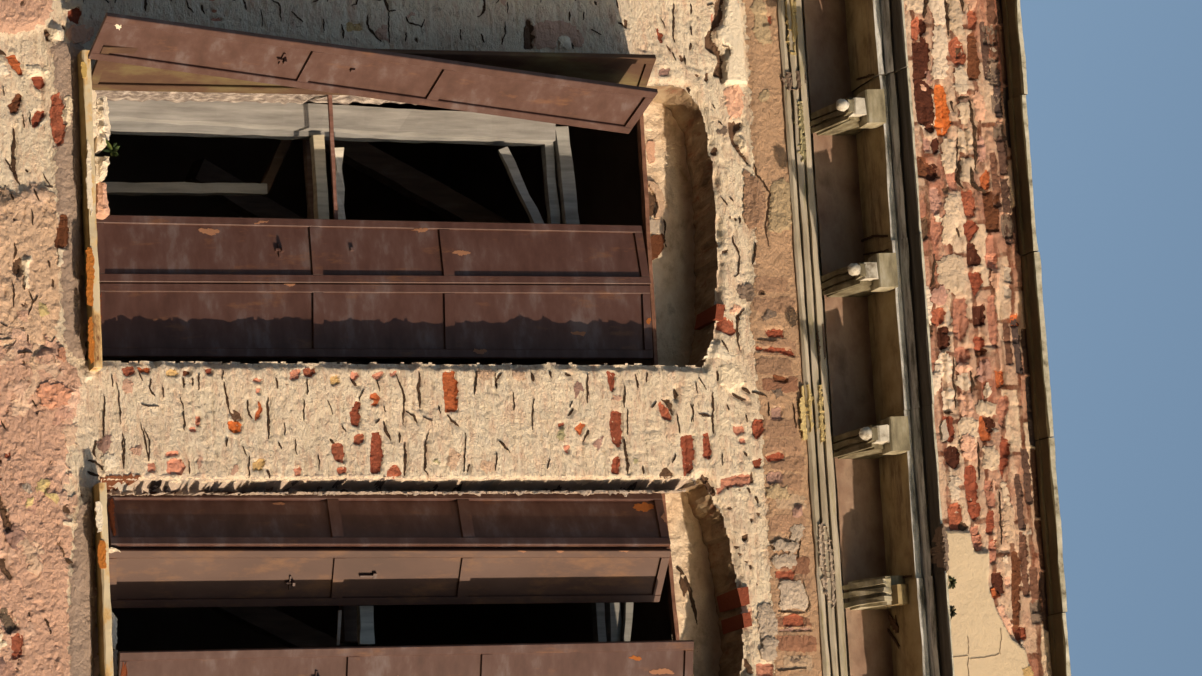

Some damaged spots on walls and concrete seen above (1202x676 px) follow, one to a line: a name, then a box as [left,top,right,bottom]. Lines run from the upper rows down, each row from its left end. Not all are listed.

flaking render [694,304,735,336]
flaking render [756,329,794,357]
flaking render [733,407,781,444]
flaking render [716,452,784,495]
flaking render [775,570,795,580]
flaking render [717,587,753,634]
flaking render [782,614,804,627]
flaking render [756,663,774,676]